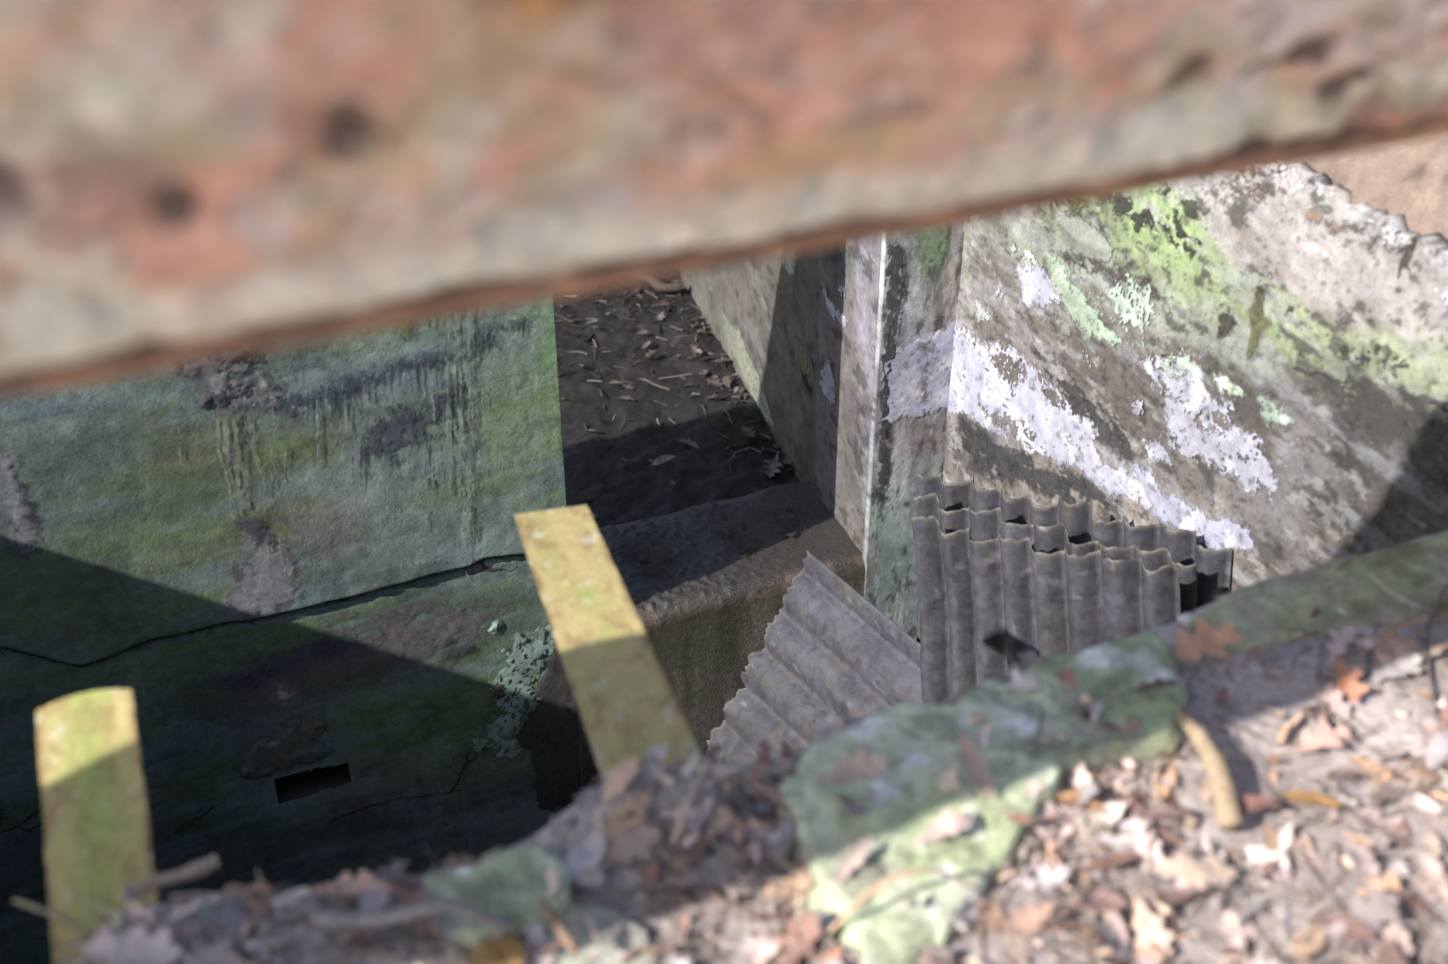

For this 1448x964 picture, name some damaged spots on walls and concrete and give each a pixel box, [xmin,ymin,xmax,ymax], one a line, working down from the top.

damp [217,415,286,519]
damp [270,313,531,578]
crack [0,554,525,667]